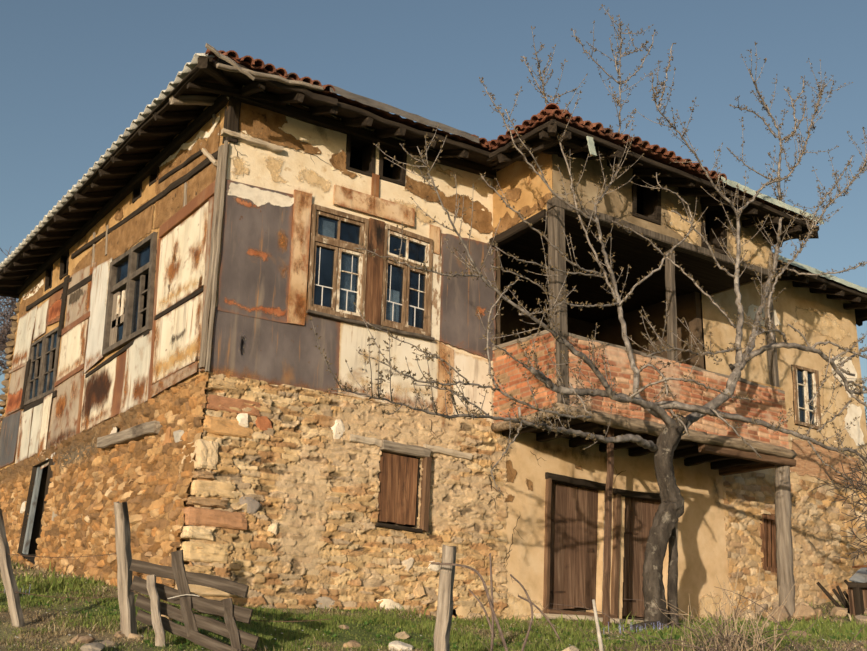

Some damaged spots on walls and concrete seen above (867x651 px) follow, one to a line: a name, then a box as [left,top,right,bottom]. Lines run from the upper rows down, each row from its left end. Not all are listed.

flaking render [228,102,361,207]
flaking render [72,97,229,275]
flaking render [389,175,553,237]
corrosion [48,265,94,323]
corrosion [167,261,179,280]
corrosion [192,221,207,263]
corrosion [247,249,268,261]
corrosion [225,296,306,319]
corrosion [123,303,201,404]
corrosion [37,324,111,458]